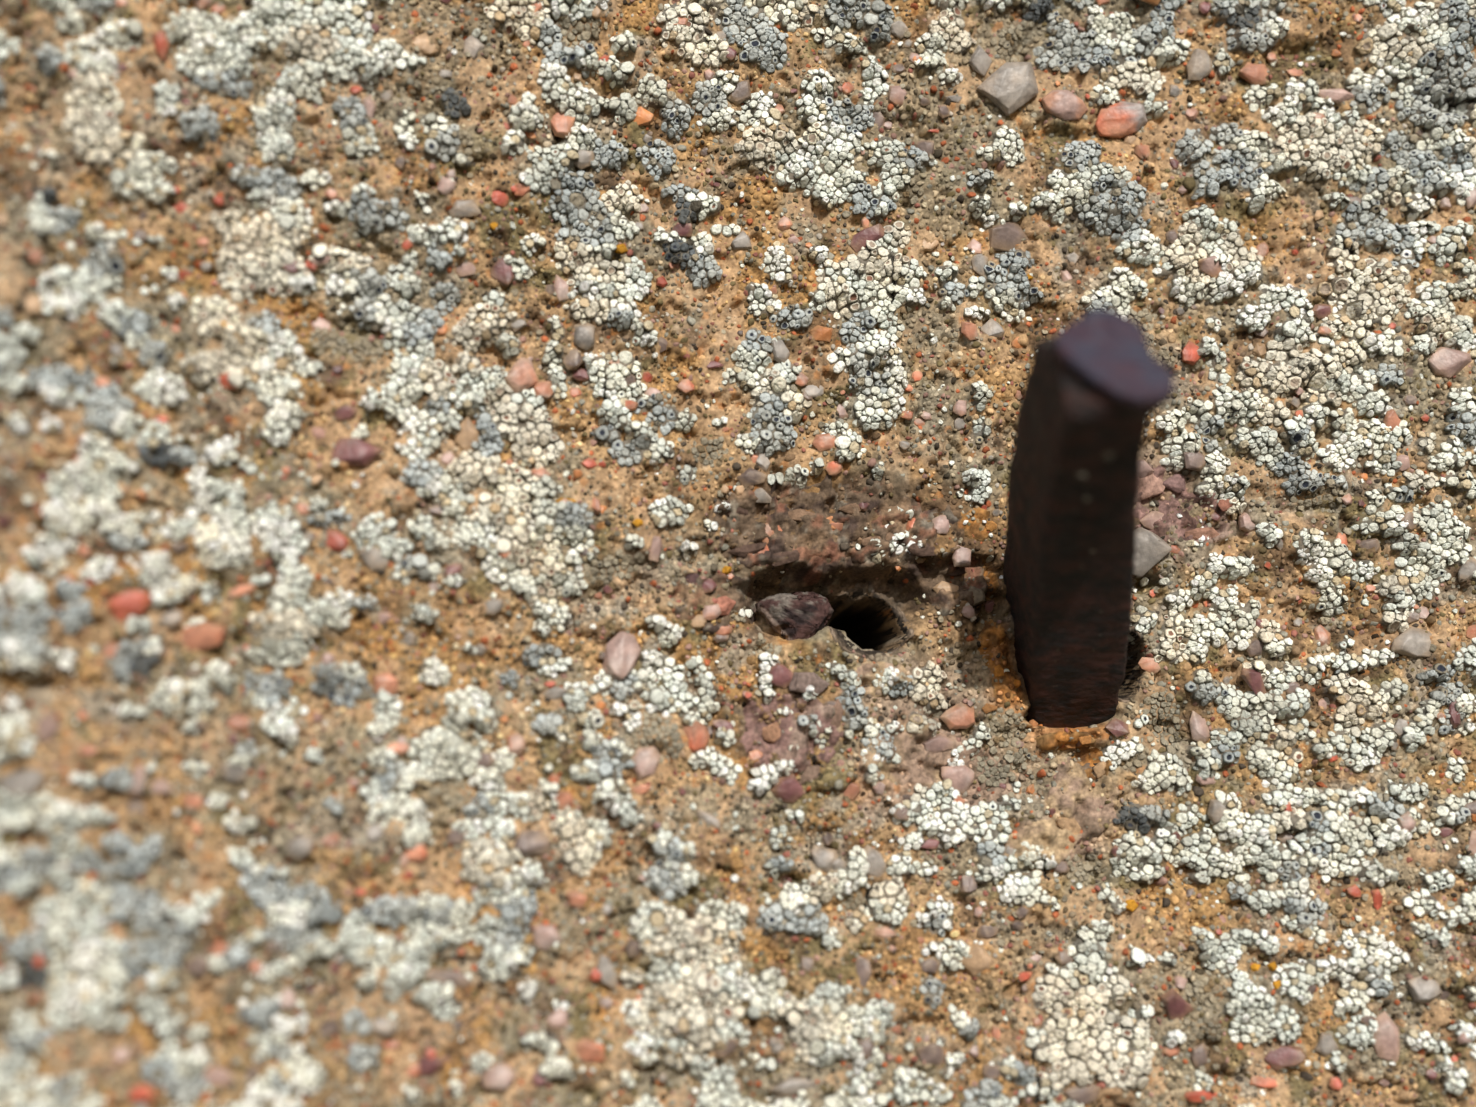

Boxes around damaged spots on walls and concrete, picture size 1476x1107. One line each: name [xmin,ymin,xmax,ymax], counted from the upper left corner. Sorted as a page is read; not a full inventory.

spalling [672,472,989,636]